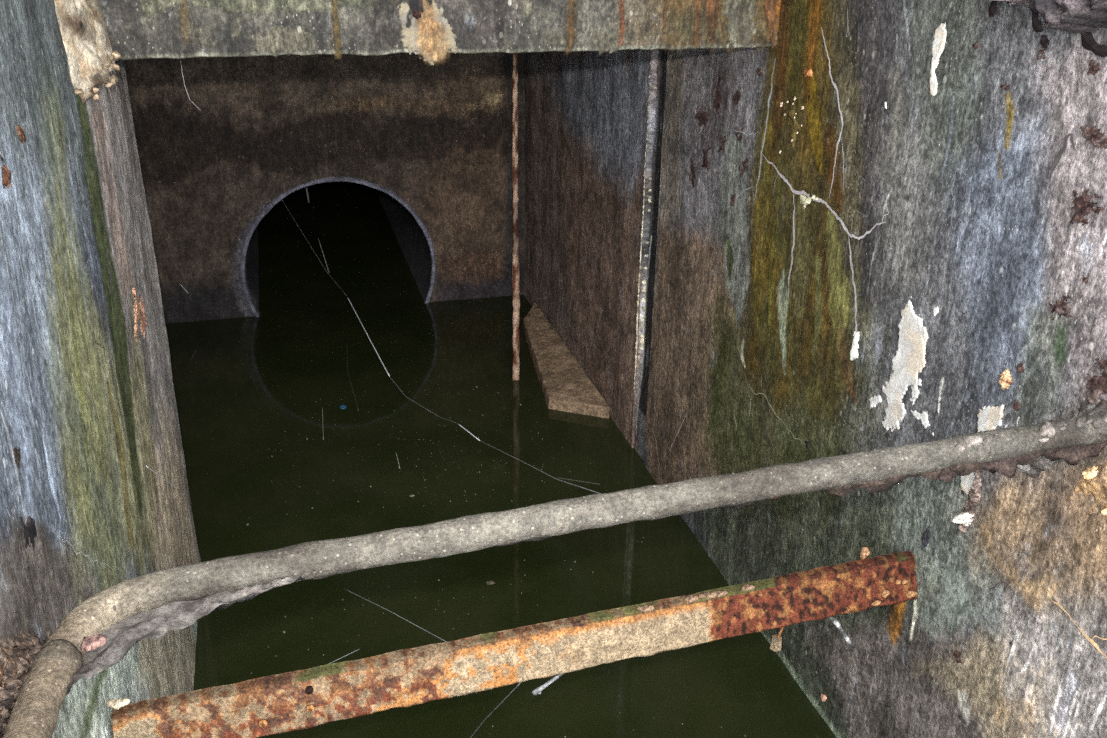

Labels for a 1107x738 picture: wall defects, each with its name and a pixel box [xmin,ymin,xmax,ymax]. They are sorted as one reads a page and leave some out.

spalling [397,0,458,65]
damp [720,0,756,47]
peeling [929,22,947,97]
spalling [989,0,1107,76]
damp [694,72,741,128]
crack [733,10,889,361]
damp [688,127,750,322]
peeling [869,296,939,436]
damp [107,379,133,547]
corrosion [636,604,655,612]
corrosion [684,590,728,604]
corrosion [872,579,918,642]